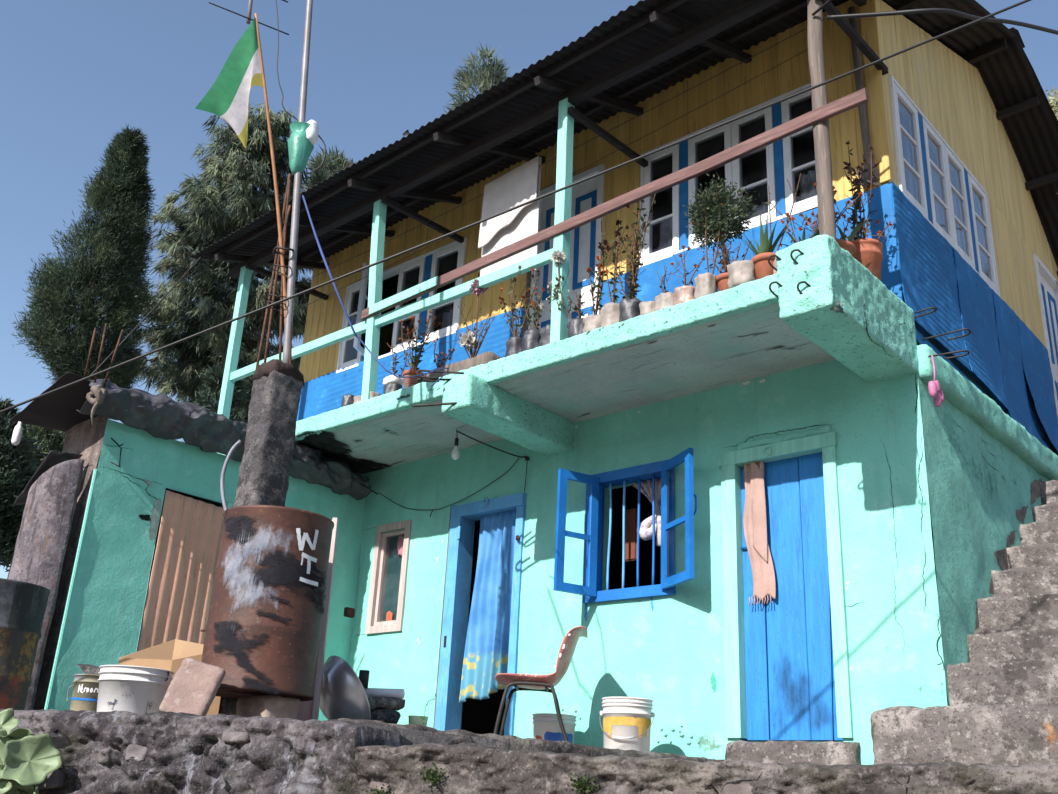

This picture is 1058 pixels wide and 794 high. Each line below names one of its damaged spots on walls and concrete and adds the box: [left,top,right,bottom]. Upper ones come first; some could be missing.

crack [83,444,159,511]
crack [883,374,944,669]
peeling [990,478,1042,597]
spalling [974,602,1001,635]